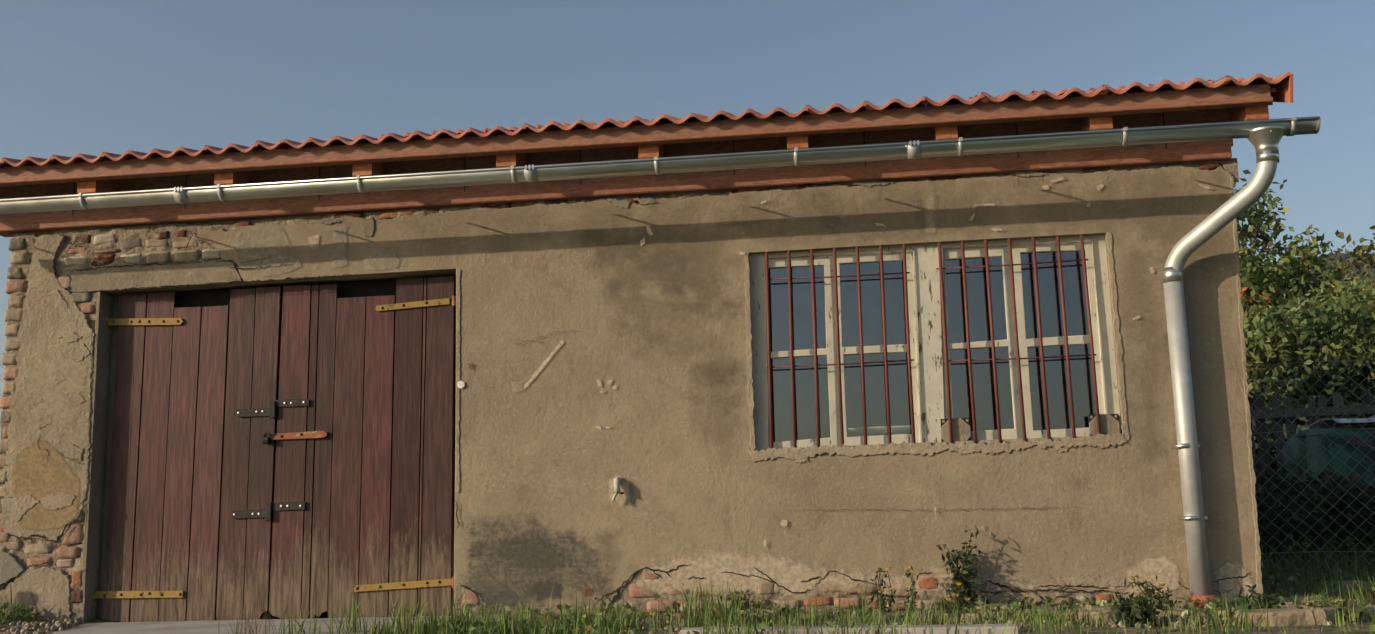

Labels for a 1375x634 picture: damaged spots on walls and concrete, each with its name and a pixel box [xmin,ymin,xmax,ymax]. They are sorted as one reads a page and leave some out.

spalling [52,158,1239,320]
peeling [0,233,90,620]
spalling [1220,218,1263,599]
spalling [455,580,485,618]
damp [469,519,608,614]
crack [594,564,876,607]
spalling [607,570,1119,617]